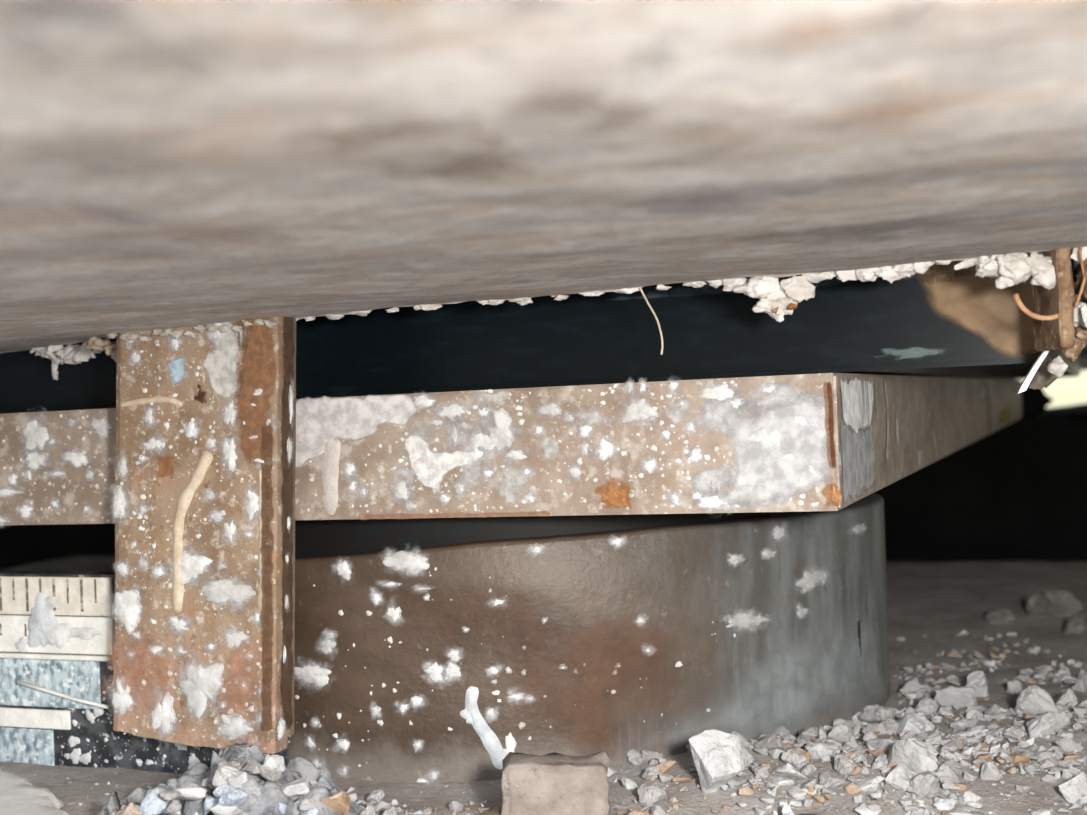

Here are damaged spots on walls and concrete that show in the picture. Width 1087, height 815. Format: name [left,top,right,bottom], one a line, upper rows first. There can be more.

water stain [640,283,735,298]
water stain [776,275,848,286]
water stain [883,347,942,359]
rust [157,457,177,477]
rust [595,479,631,508]
rust [822,482,842,506]
rust [230,317,295,731]
rust [112,646,166,697]
water stain [725,629,881,725]